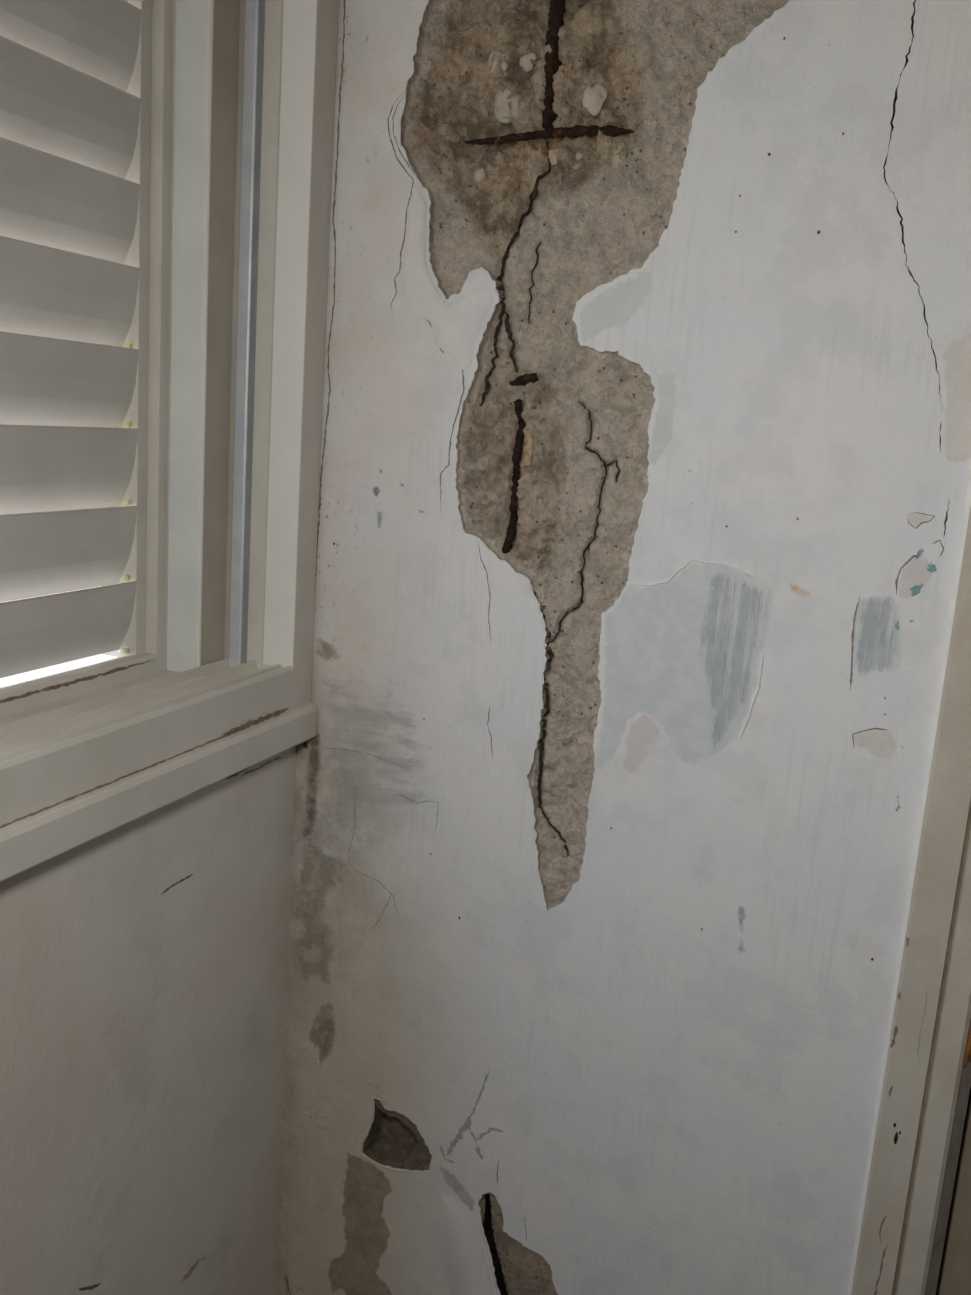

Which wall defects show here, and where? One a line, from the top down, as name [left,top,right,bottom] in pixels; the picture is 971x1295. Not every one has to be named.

crack [883,0,942,451]
spalling [399,0,790,911]
crack [478,543,491,640]
crack [531,402,620,857]
peeling [327,1096,432,1295]
crack [483,1161,527,1295]
spalling [478,1192,558,1295]